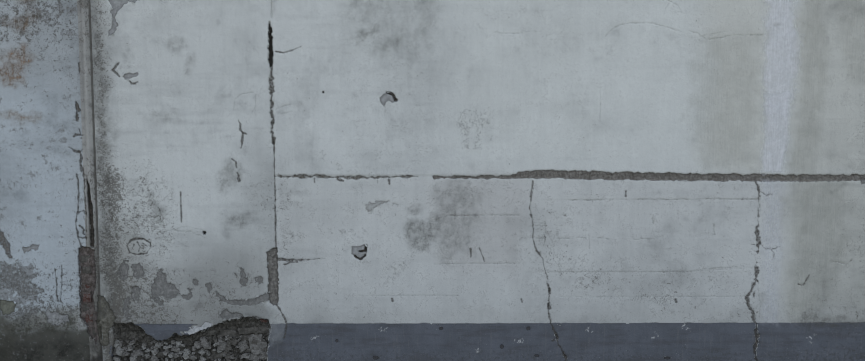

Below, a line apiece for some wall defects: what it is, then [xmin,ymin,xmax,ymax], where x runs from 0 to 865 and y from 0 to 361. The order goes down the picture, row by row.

peeling [109,0,137,37]
crack [268,24,319,265]
spalling [380,92,398,106]
peeling [0,222,69,326]
spalling [78,181,280,361]
spalling [352,244,367,260]
crack [529,185,567,361]
crack [745,182,777,361]